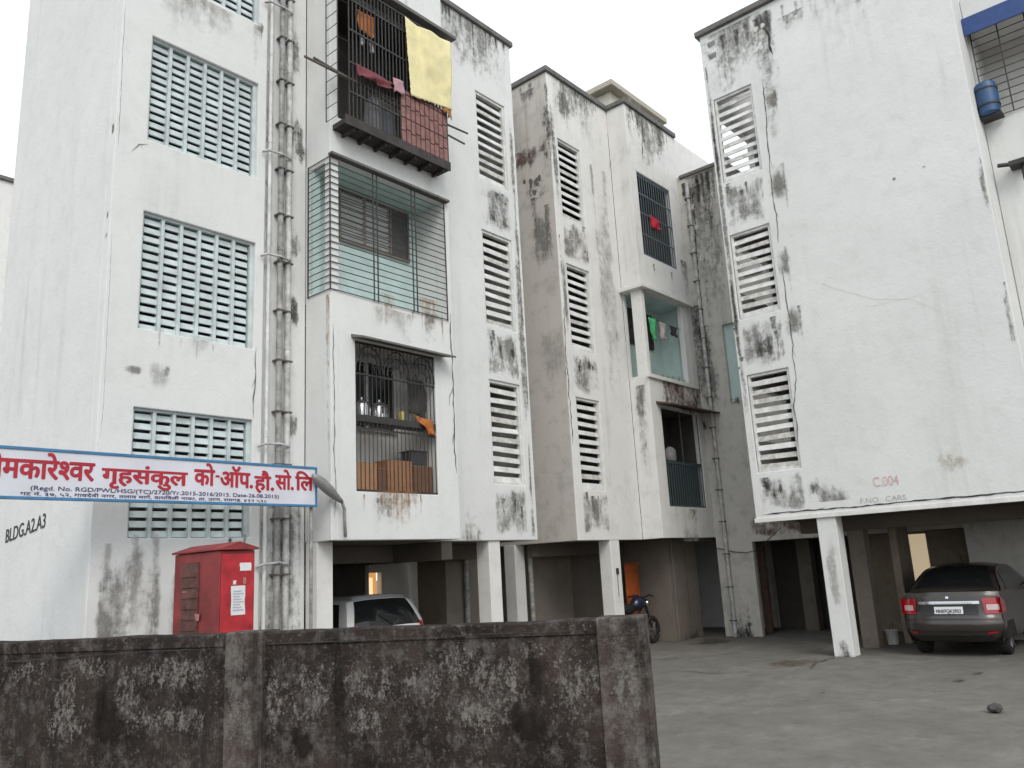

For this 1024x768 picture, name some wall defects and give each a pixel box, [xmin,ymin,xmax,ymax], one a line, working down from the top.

damp [705,10,771,82]
crack [759,13,773,55]
damp [628,95,667,159]
damp [774,174,785,194]
damp [488,83,593,403]
damp [682,115,779,360]
crack [762,84,883,439]
damp [500,448,534,530]
damp [586,492,607,532]
damp [764,477,844,507]
damp [97,553,141,638]
damp [151,574,159,627]